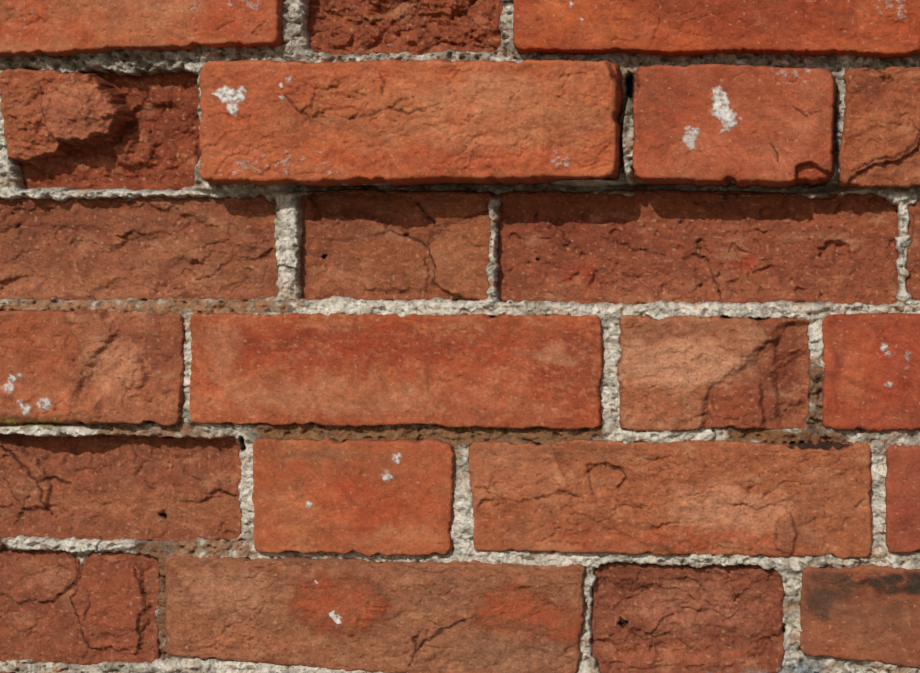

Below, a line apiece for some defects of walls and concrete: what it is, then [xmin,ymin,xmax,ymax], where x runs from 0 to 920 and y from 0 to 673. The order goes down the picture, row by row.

spalling [306,0,501,55]
spalling [298,68,920,305]
crack [375,203,473,292]
spalling [0,68,278,542]
crack [1,446,72,521]
spalling [0,315,873,673]
crack [41,568,90,658]
crack [134,568,146,646]
crack [412,615,476,659]